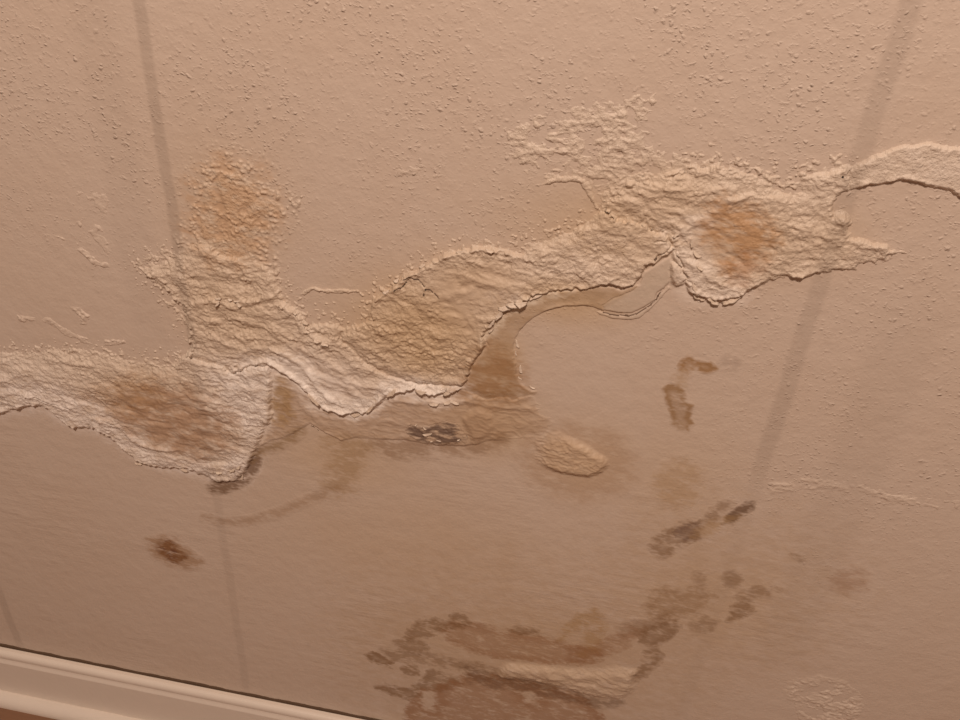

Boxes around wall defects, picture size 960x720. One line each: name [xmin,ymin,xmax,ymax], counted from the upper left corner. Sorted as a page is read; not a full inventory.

crack [603,288,664,317]
damp [650,203,768,314]
flaking render [404,420,466,442]
damp [0,281,936,720]